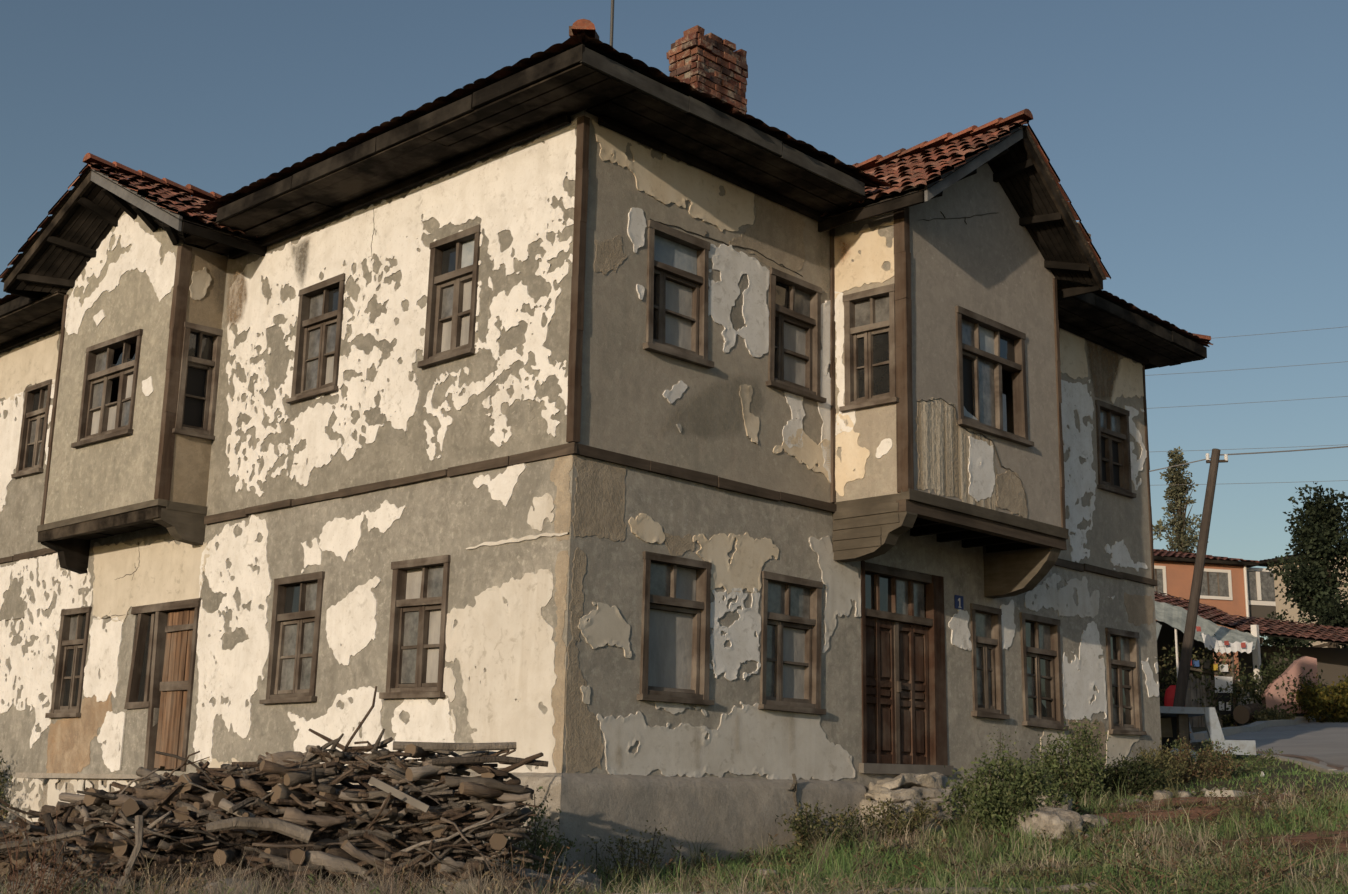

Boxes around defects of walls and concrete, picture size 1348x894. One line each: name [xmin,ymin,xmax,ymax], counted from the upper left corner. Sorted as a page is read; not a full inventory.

peeling [0,214,212,512]
peeling [225,118,770,497]
peeling [773,218,894,496]
peeling [0,515,273,833]
peeling [301,500,406,574]
peeling [288,569,558,773]
peeling [473,463,526,507]
peeling [580,685,856,781]
peeling [692,532,779,681]
peeling [809,536,861,653]
peeling [968,436,995,502]
peeling [1000,328,1148,771]